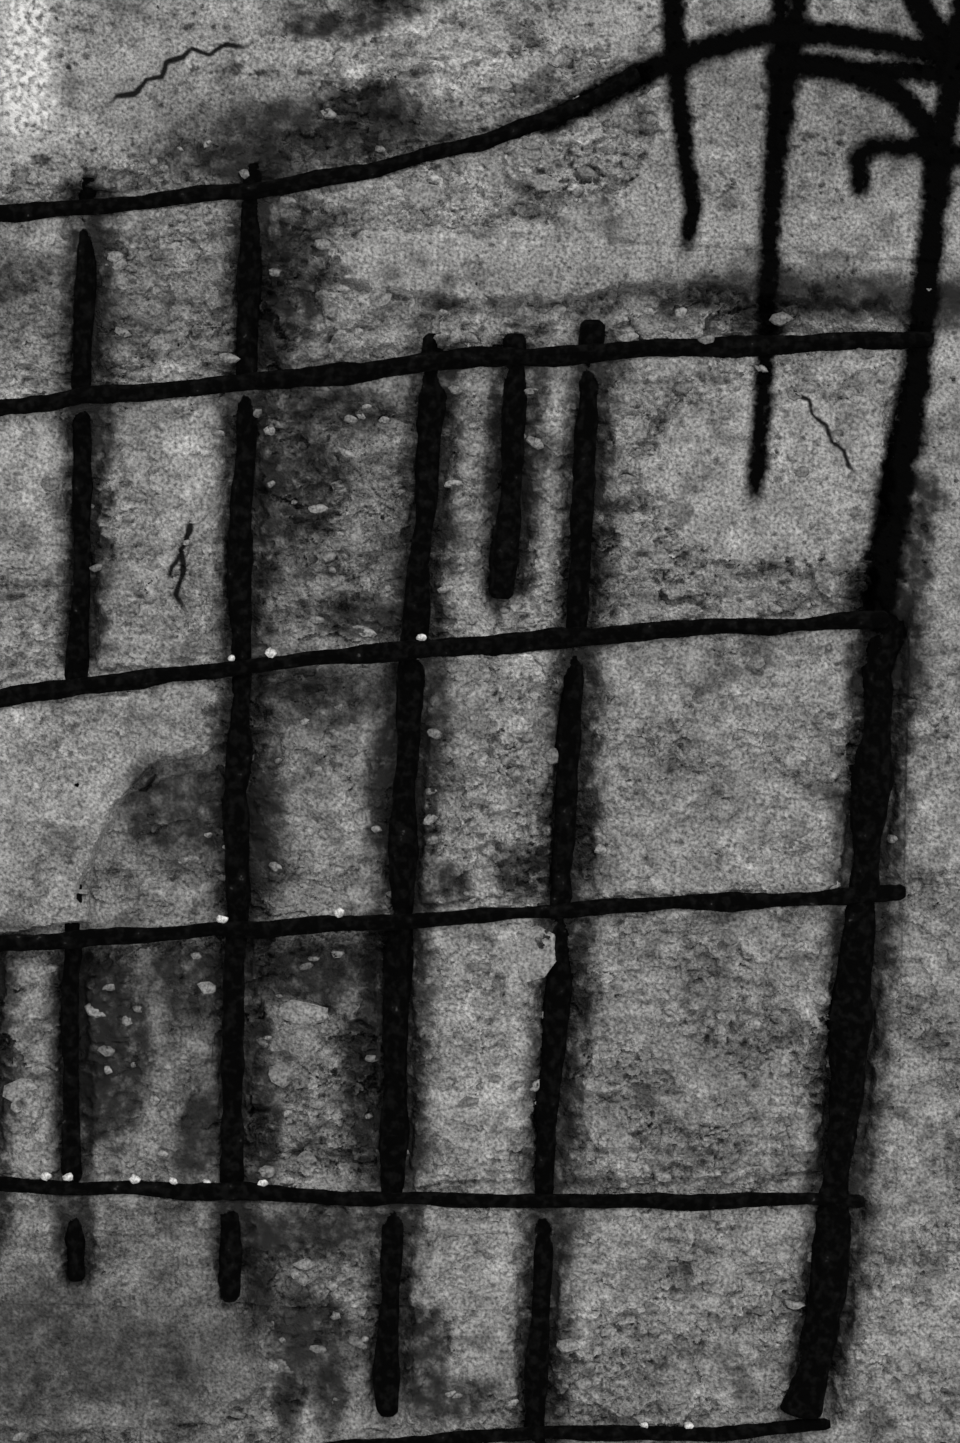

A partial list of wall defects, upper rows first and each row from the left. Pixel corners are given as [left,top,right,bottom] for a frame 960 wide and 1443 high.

crack [112,42,244,101]
spalling [0,0,906,385]
spalling [0,348,906,1443]
spalling [819,598,960,1443]